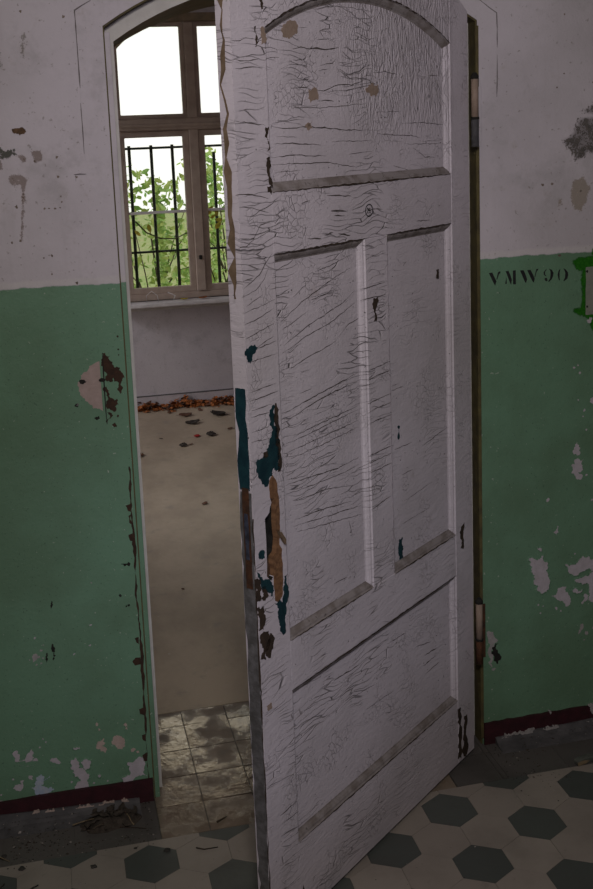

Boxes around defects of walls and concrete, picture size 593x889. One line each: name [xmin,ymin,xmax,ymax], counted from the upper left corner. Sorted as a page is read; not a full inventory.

crack [233,27,443,172]
water stain [0,147,17,159]
crack [238,194,269,248]
crack [243,195,385,368]
crack [251,361,401,457]
crack [289,429,445,532]
peeling [571,444,588,480]
peeling [527,546,593,614]
peeling [12,738,54,795]
peeling [50,745,108,789]
peeling [95,722,147,782]
peeling [502,725,559,739]